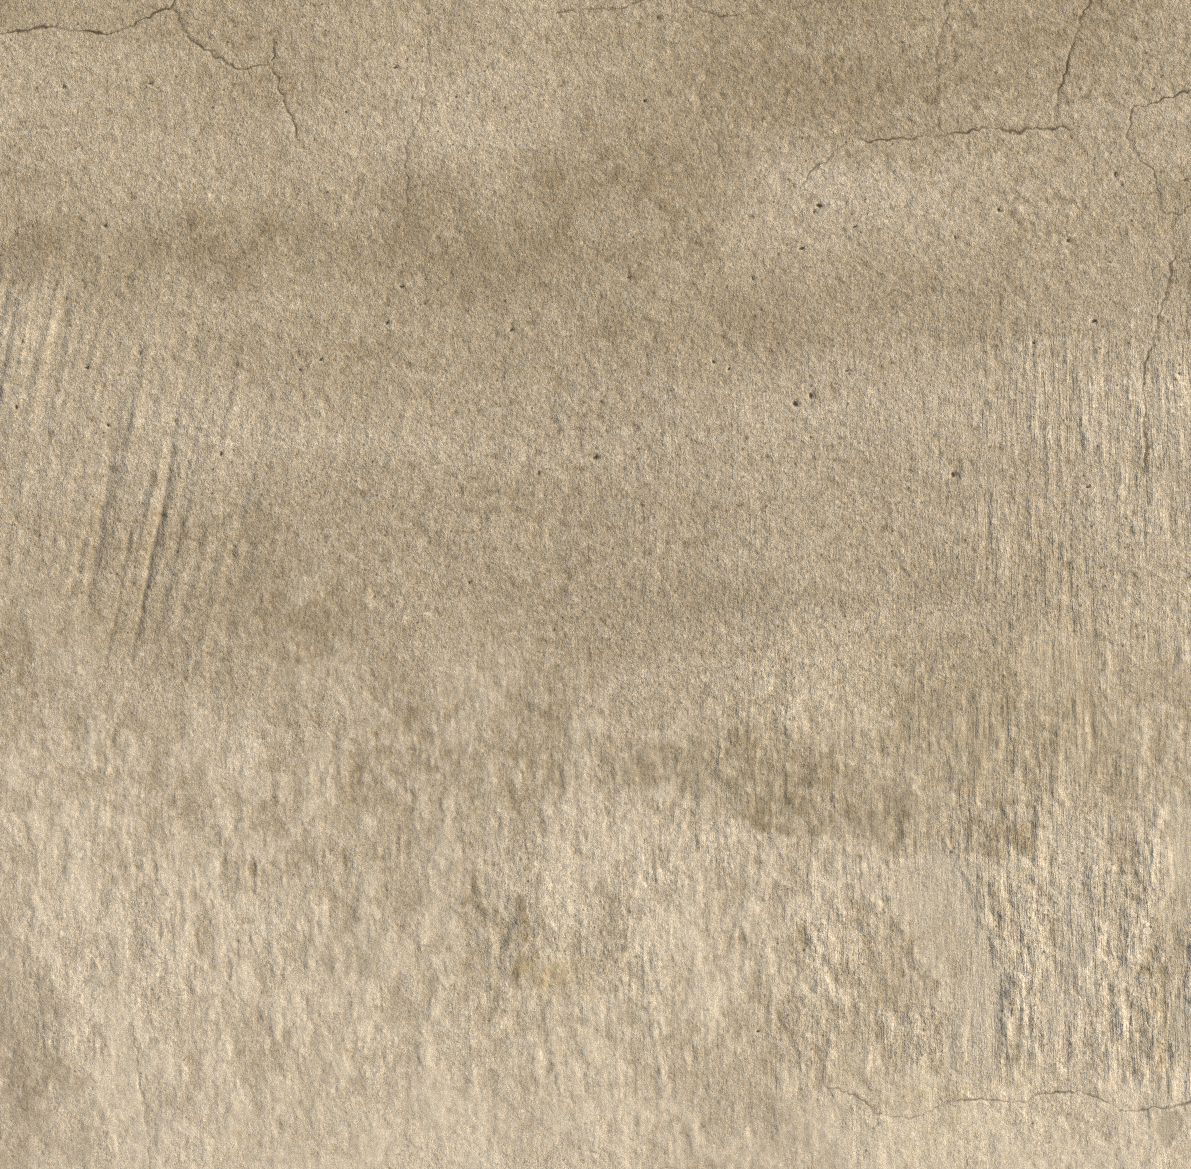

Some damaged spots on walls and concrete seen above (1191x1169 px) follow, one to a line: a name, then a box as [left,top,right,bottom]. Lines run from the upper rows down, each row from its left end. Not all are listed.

crack [82,1,175,35]
damp [584,550,1187,984]